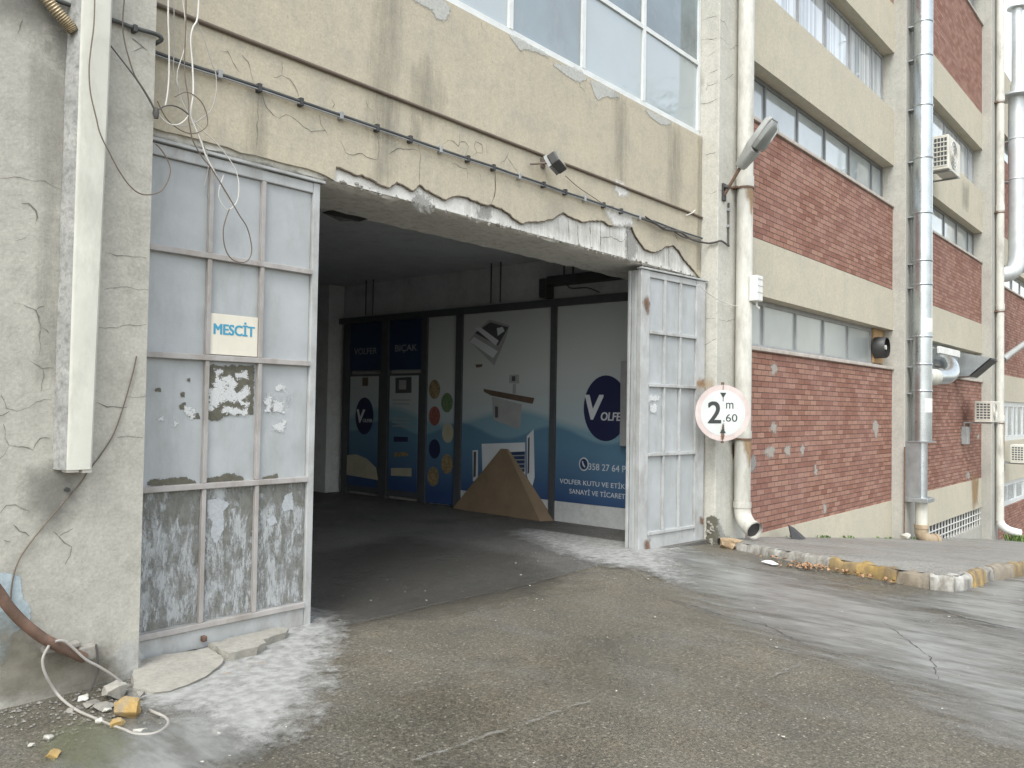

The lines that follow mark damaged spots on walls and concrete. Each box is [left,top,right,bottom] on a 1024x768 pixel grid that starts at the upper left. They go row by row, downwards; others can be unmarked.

crack [227,51,299,139]
peeling [510,34,620,100]
crack [301,105,420,183]
crack [444,133,518,201]
crack [4,177,48,241]
spalling [322,166,694,277]
crack [0,395,48,459]
peeling [179,364,255,421]
peeling [140,473,305,632]
peeling [0,573,31,656]
damp [515,529,1024,730]
damp [63,611,343,768]